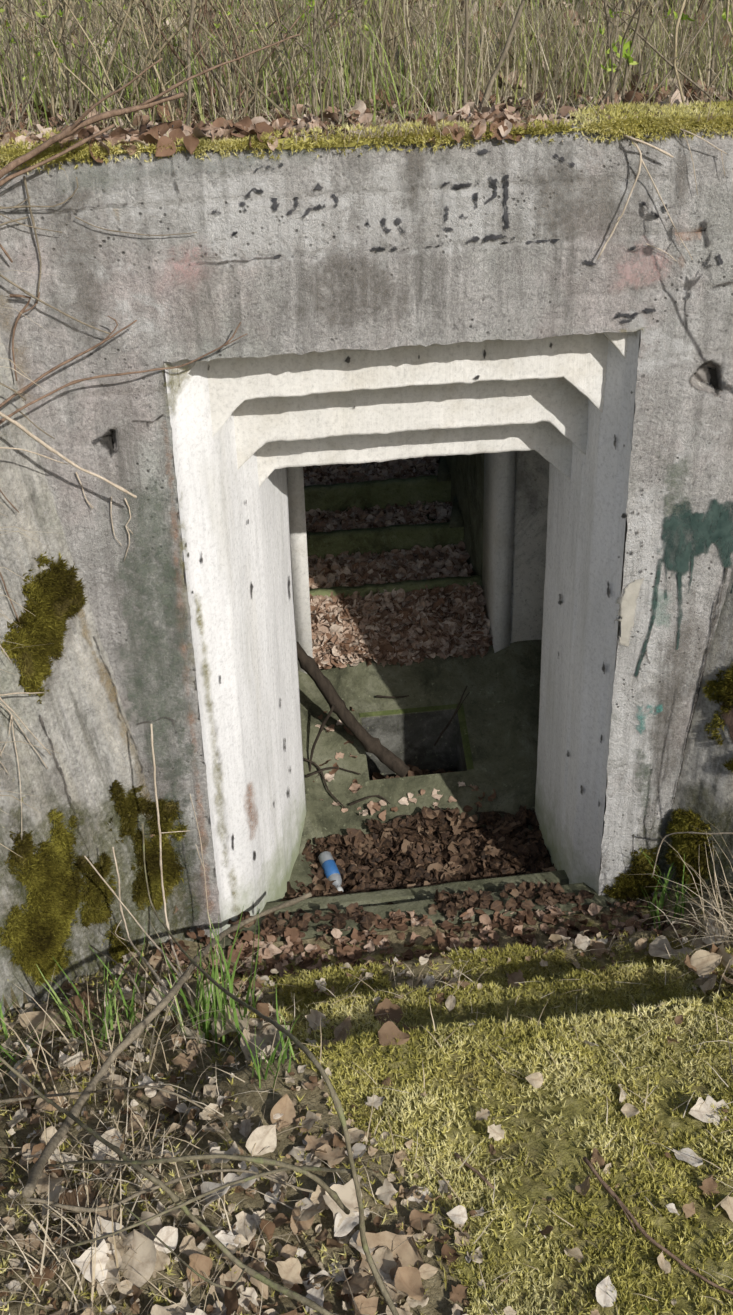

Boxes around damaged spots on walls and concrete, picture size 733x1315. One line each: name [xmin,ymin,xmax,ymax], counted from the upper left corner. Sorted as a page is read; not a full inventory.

spalling [690,361,722,396]
spalling [93,430,117,456]